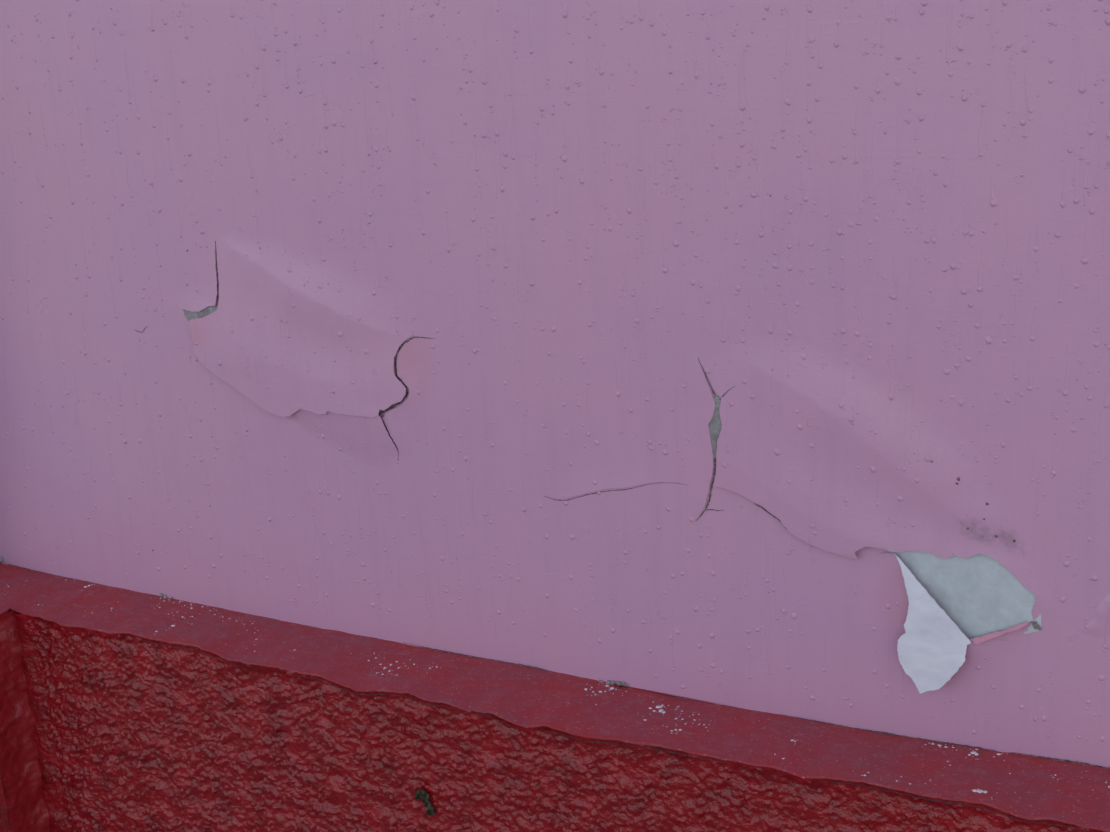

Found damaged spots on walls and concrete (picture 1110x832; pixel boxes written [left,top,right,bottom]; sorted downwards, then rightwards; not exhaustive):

crack [676,359,735,521]
peeling [703,334,1055,694]